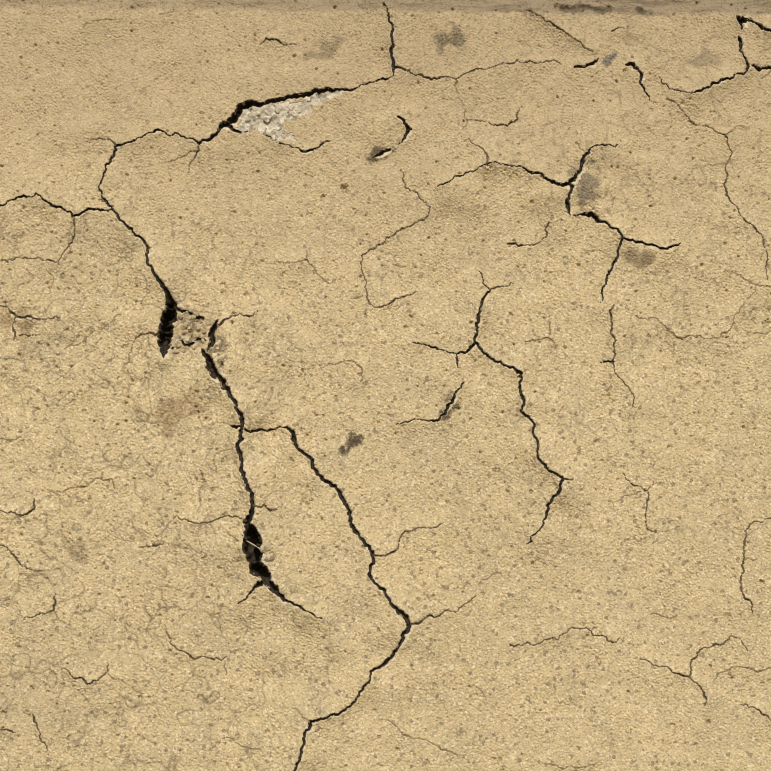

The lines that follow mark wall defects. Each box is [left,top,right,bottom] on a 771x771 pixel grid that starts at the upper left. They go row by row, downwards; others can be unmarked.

crack [574,58,599,68]
flaking render [235,90,343,143]
crack [625,16,771,340]
crack [437,138,681,303]
crack [0,3,574,771]
crack [600,304,635,418]
crack [607,473,659,532]
crack [739,518,771,617]
crack [509,627,621,647]
crack [639,635,771,706]
crack [740,703,771,721]
crack [547,762,595,770]